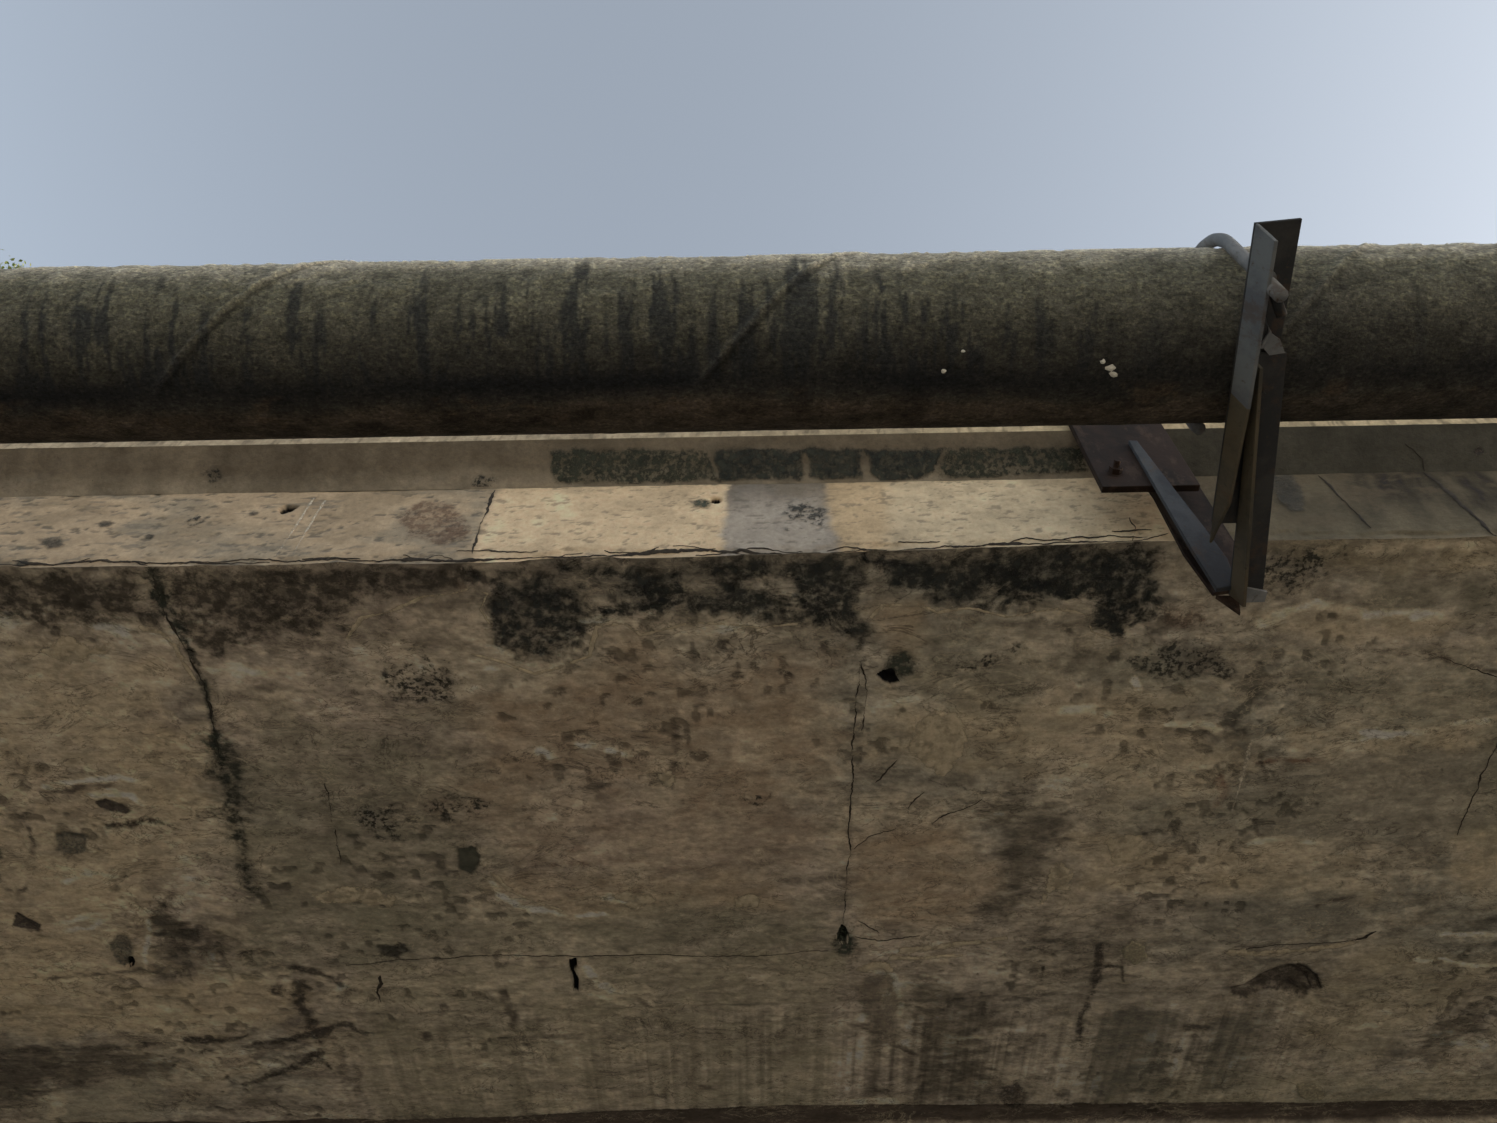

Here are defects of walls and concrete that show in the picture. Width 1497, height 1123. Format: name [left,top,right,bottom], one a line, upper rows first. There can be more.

damp [40,538,63,548]
crack [0,490,1168,765]
crack [1429,654,1497,677]
damp [0,544,1164,893]
crack [346,662,982,1002]
crack [1457,745,1497,835]
spalling [1225,941,1356,997]